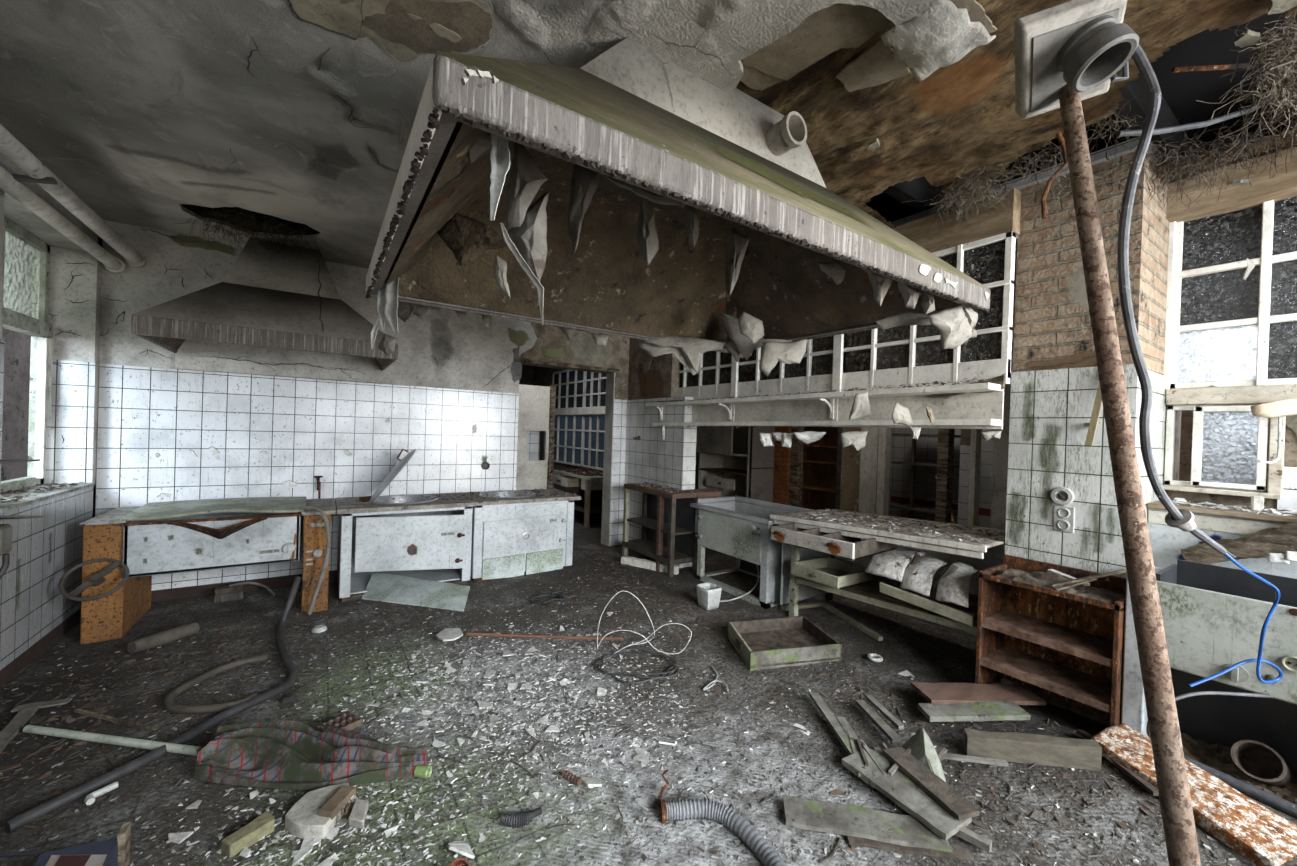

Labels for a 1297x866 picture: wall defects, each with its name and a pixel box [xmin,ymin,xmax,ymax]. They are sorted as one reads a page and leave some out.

spalling [288,0,499,84]
crack [649,24,732,112]
spalling [740,0,997,92]
peeling [918,264,958,288]
water stain [1030,416,1059,469]